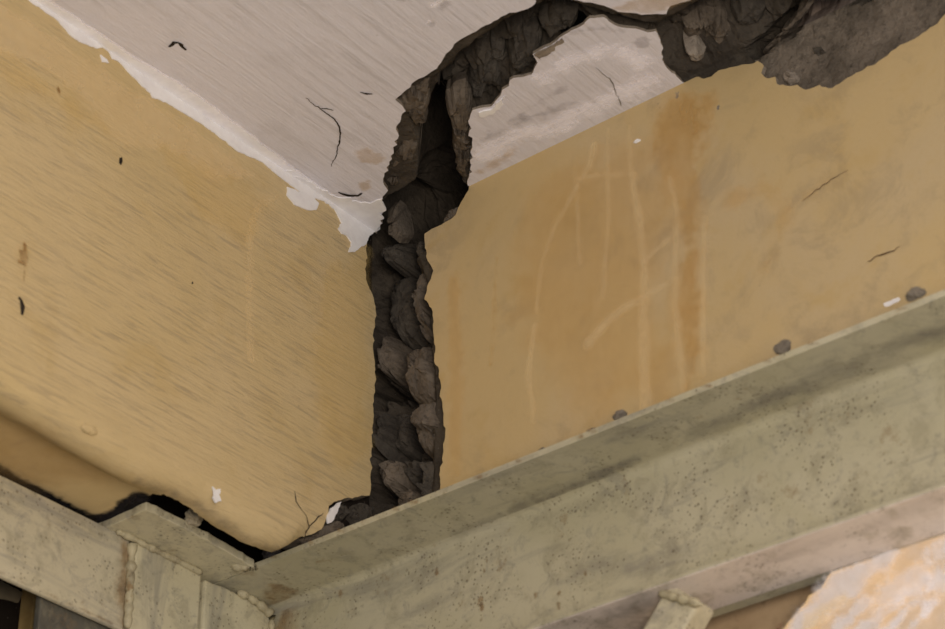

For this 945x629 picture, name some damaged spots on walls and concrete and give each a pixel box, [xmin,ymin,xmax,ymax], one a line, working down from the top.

peeling [28,0,386,252]
crack [306,98,341,167]
crack [338,0,815,517]
spalling [755,0,945,90]